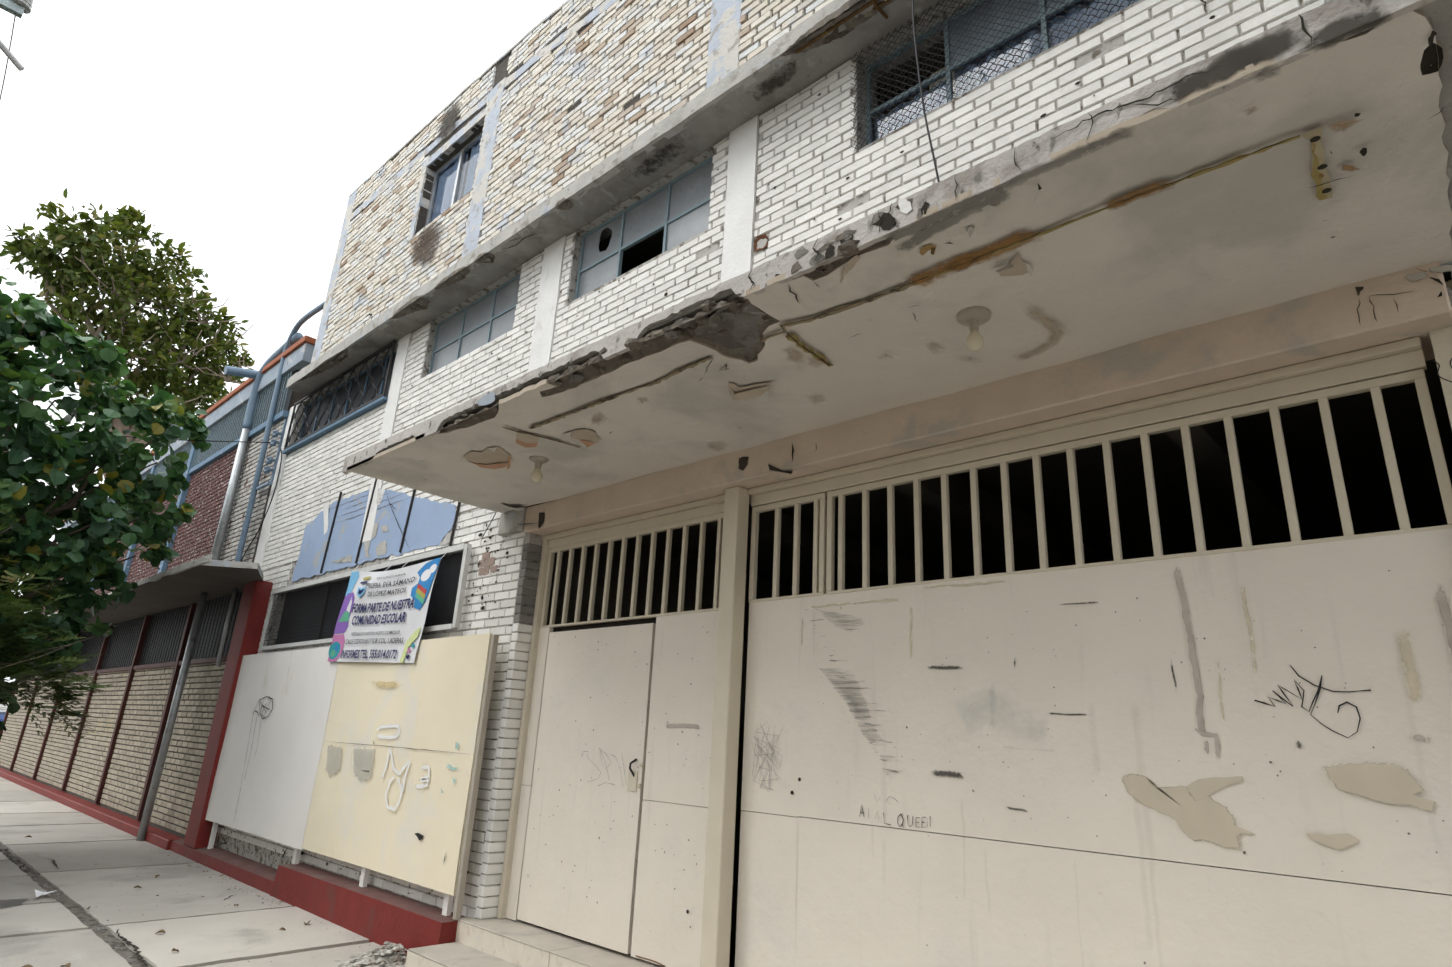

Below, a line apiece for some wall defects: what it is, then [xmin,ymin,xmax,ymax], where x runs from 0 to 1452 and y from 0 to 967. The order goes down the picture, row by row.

spalling [555,198,573,210]
corrosion [1107,183,1168,209]
water stain [412,223,442,265]
spalling [754,234,768,252]
spalling [775,198,929,283]
corrosion [909,231,1036,286]
spalling [531,270,779,397]